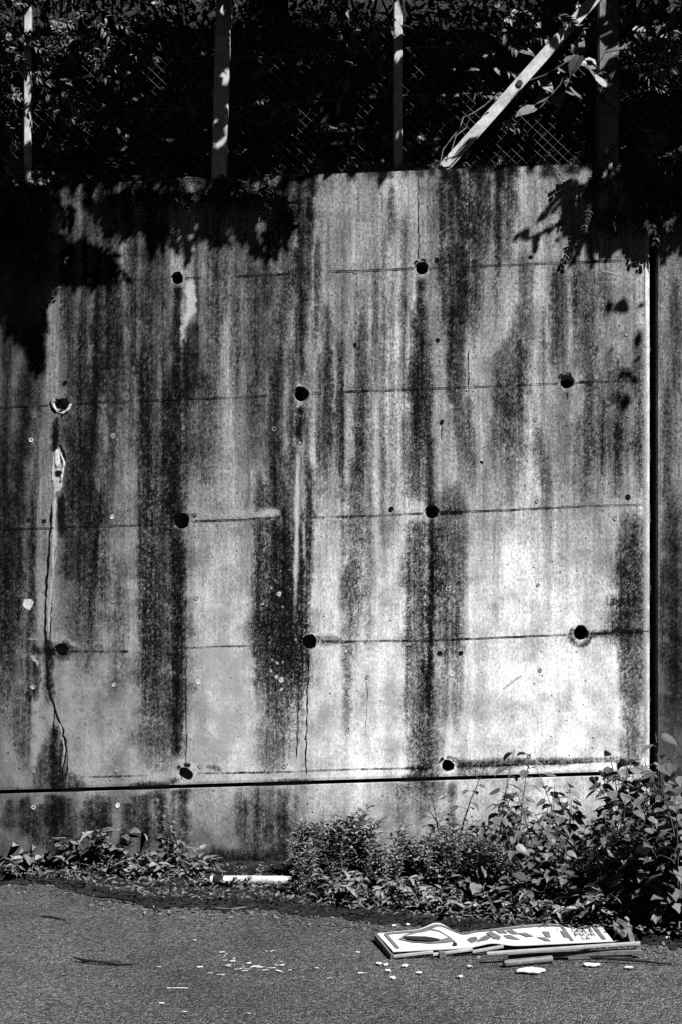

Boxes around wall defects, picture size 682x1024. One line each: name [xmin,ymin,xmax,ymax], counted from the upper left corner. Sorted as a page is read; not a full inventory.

crack [44,505,68,782]
peeling [52,447,65,496]
water stain [0,166,518,851]
water stain [492,253,664,759]